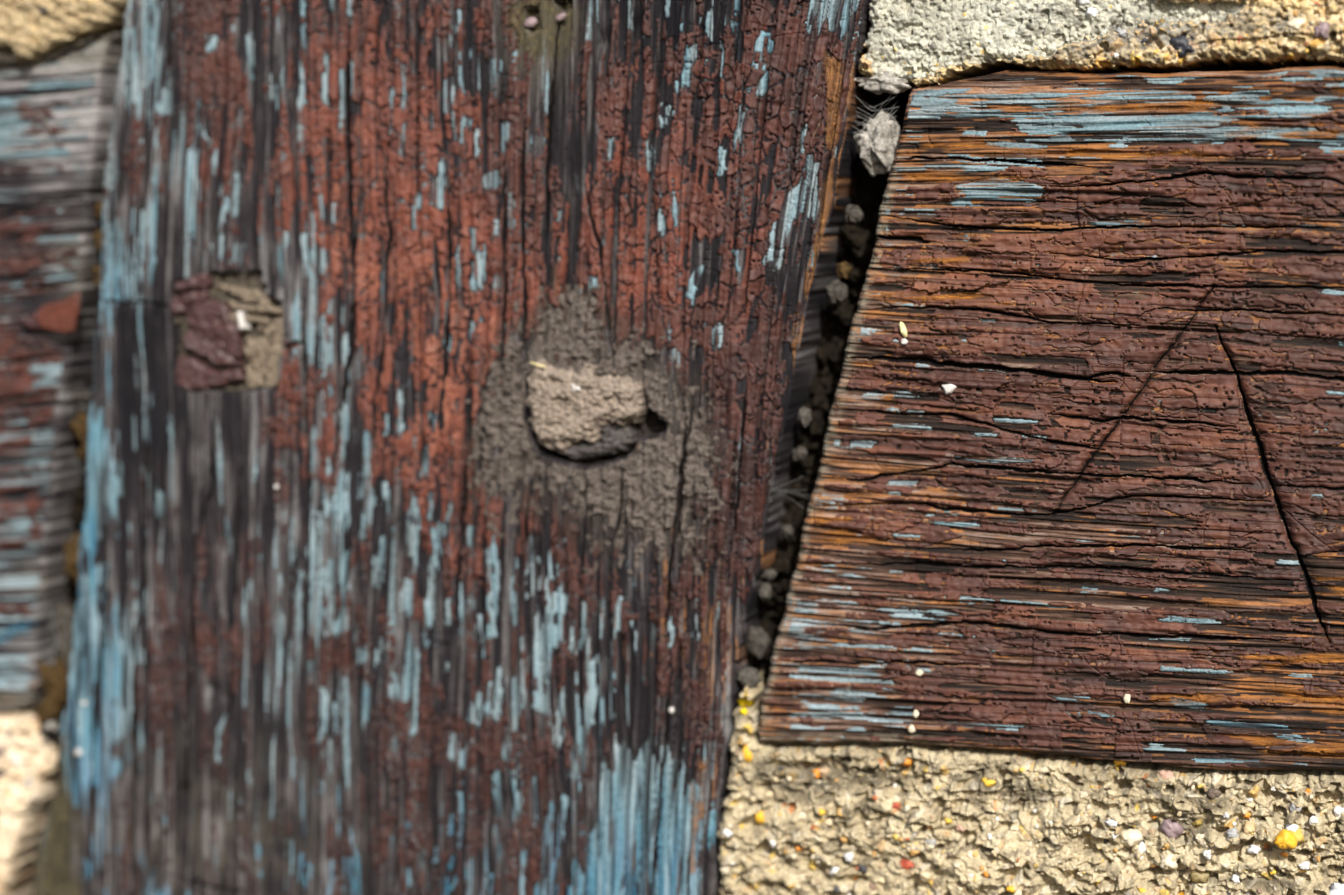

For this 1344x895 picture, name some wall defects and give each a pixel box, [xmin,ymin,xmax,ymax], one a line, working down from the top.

peeling [0,101,71,172]
spalling [0,34,106,65]
peeling [104,99,171,223]
peeling [169,0,1248,810]
peeling [764,105,1344,768]
crack [794,406,1344,581]
crack [843,355,1344,383]
peeling [103,501,294,895]
peeling [293,475,639,895]